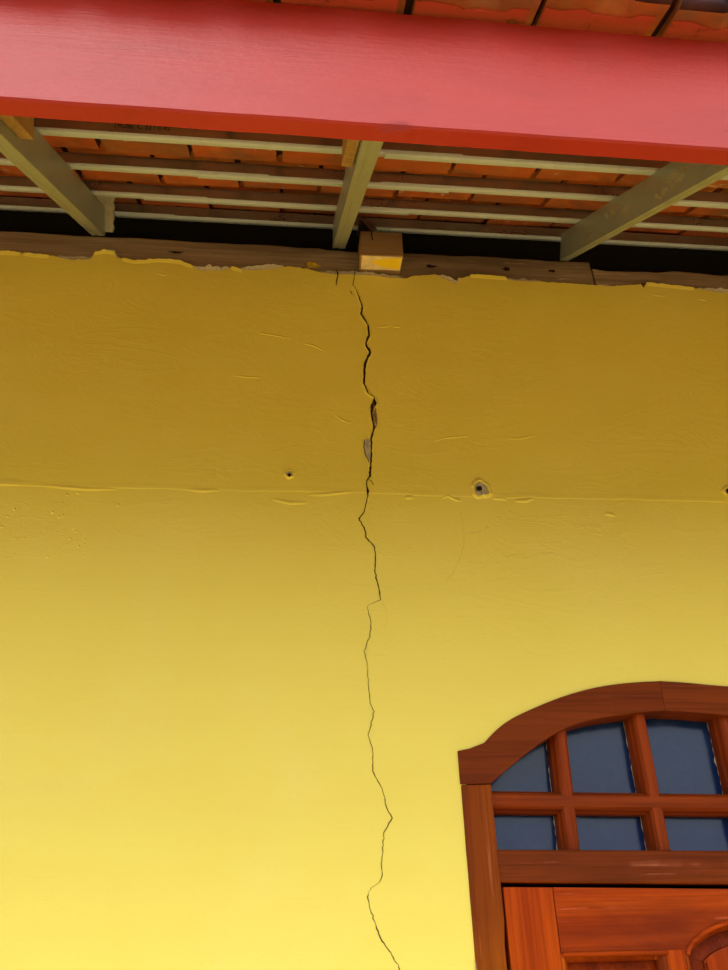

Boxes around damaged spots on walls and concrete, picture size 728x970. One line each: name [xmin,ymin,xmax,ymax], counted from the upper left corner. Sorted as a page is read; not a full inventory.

flaking render [0,249,284,273]
peeling [438,274,542,284]
peeling [647,282,728,293]
crack [336,269,400,970]